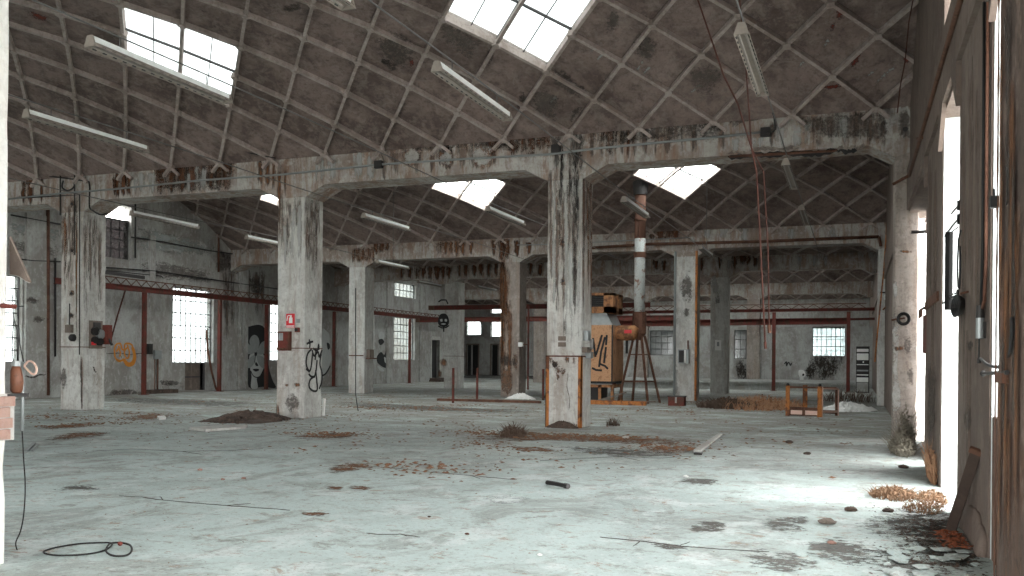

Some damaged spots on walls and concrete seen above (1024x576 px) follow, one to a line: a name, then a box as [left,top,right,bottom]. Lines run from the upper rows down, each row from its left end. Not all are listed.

water stain [50,205,102,307]
rust [154,163,232,194]
rust [352,243,390,262]
rust [400,239,543,381]
water stain [353,106,910,332]
water stain [892,316,901,429]